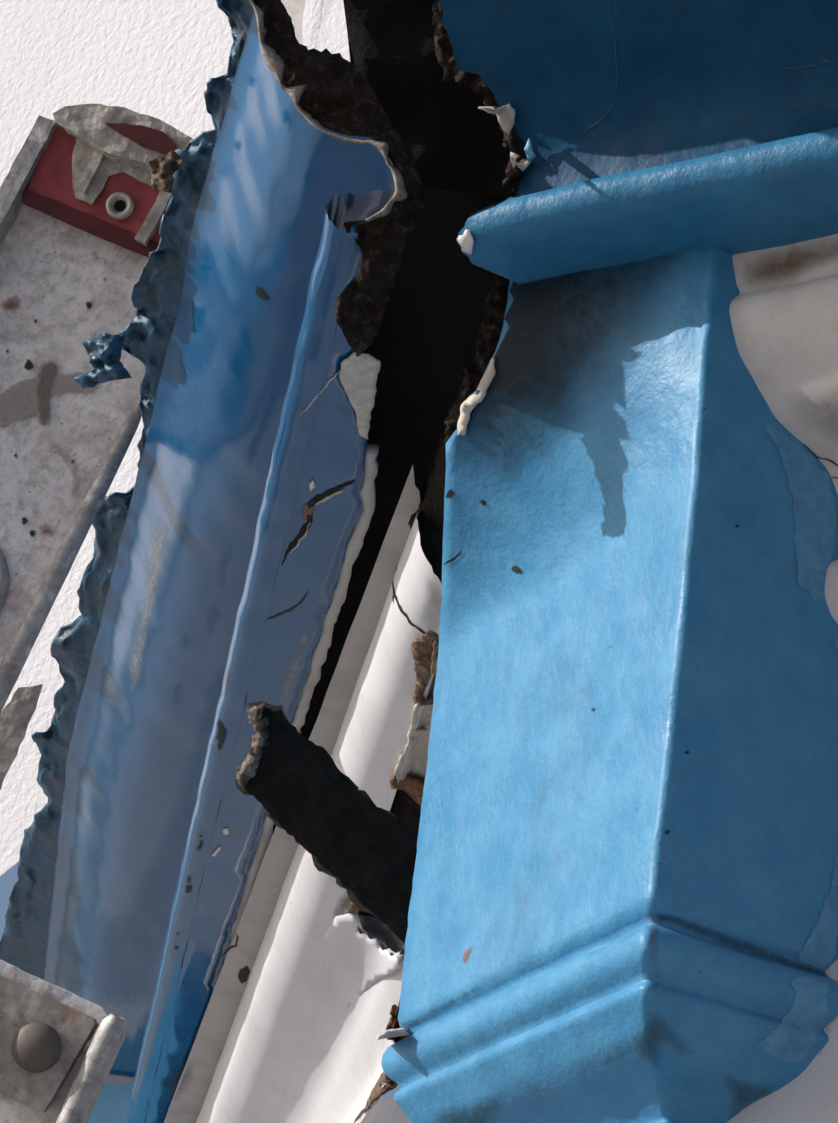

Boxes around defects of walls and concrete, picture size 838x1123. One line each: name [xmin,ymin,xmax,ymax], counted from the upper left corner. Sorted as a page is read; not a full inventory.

spalling [301,0,536,740]
crack [281,480,355,565]
crack [267,589,308,621]
crack [392,566,425,634]
peeling [216,721,226,749]
peeling [198,827,229,857]
peeling [322,913,405,1009]
peeling [376,1028,409,1040]